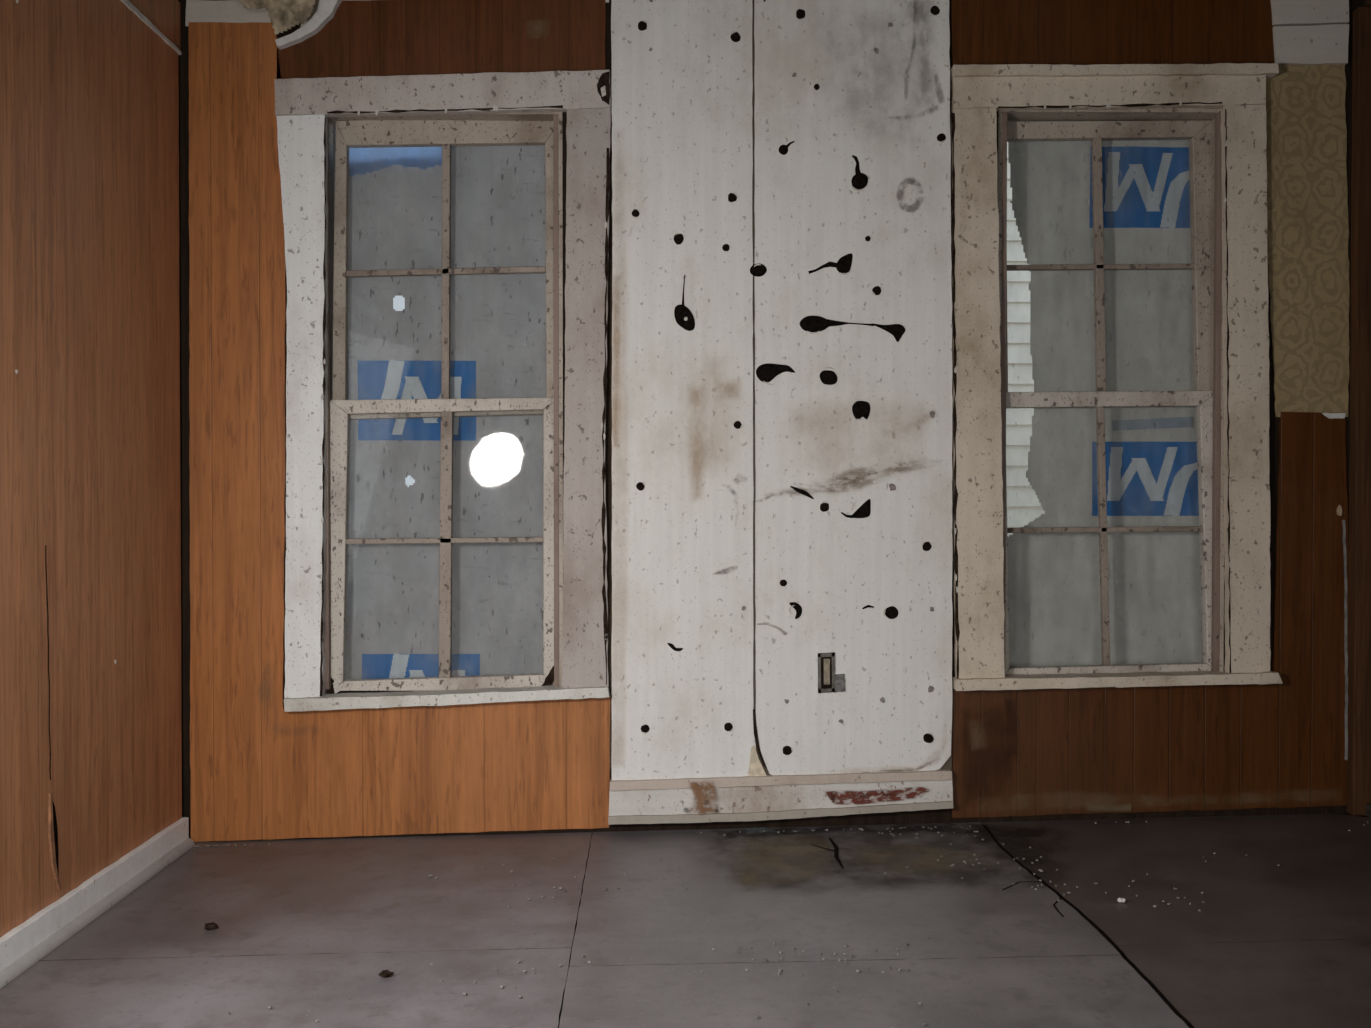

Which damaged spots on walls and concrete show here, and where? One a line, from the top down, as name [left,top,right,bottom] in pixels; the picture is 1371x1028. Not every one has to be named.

crack [44,545,52,780]
leakage [726,823,1053,886]
crack [983,825,1195,1028]